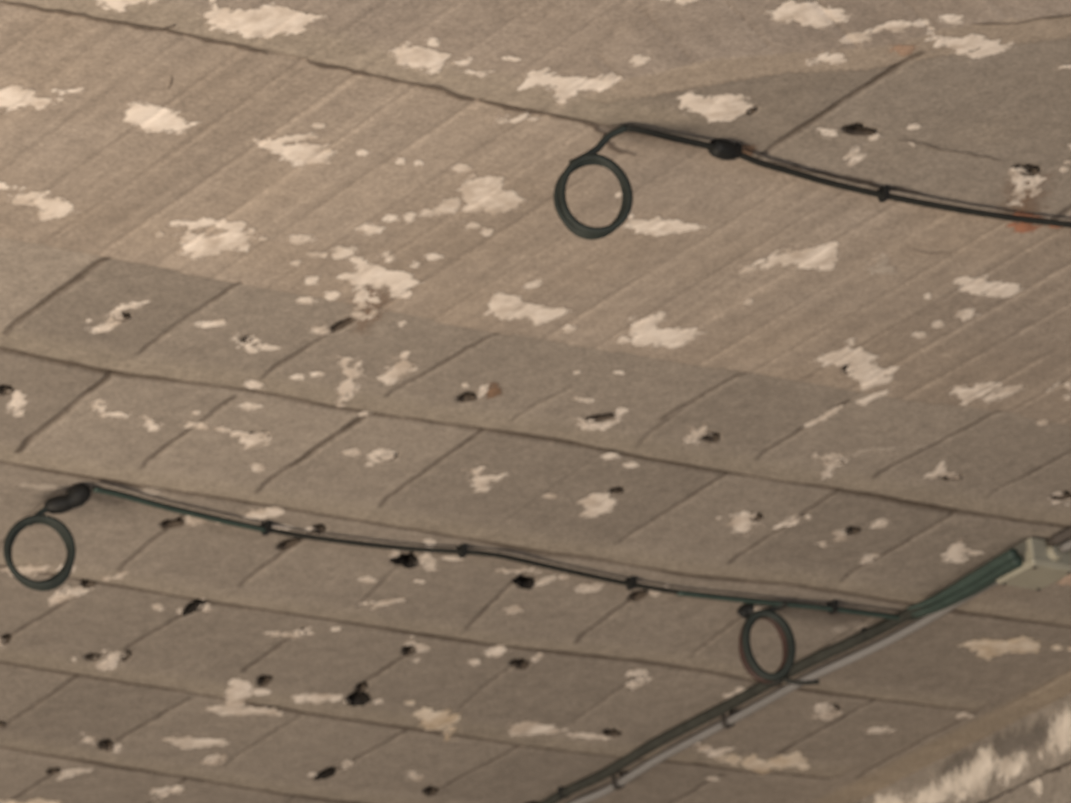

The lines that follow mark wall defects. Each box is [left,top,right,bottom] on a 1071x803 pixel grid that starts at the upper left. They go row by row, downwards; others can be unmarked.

spalling [96,0,157,12]
spalling [199,0,327,39]
spalling [629,54,651,67]
spalling [517,67,624,105]
corrosion [1008,212,1063,233]
spalling [390,539,465,584]
spalling [496,567,605,593]
spalling [359,598,406,610]
spalling [958,636,1071,661]
spalling [203,675,284,717]
spalling [291,681,384,706]
damp [941,723,1048,776]